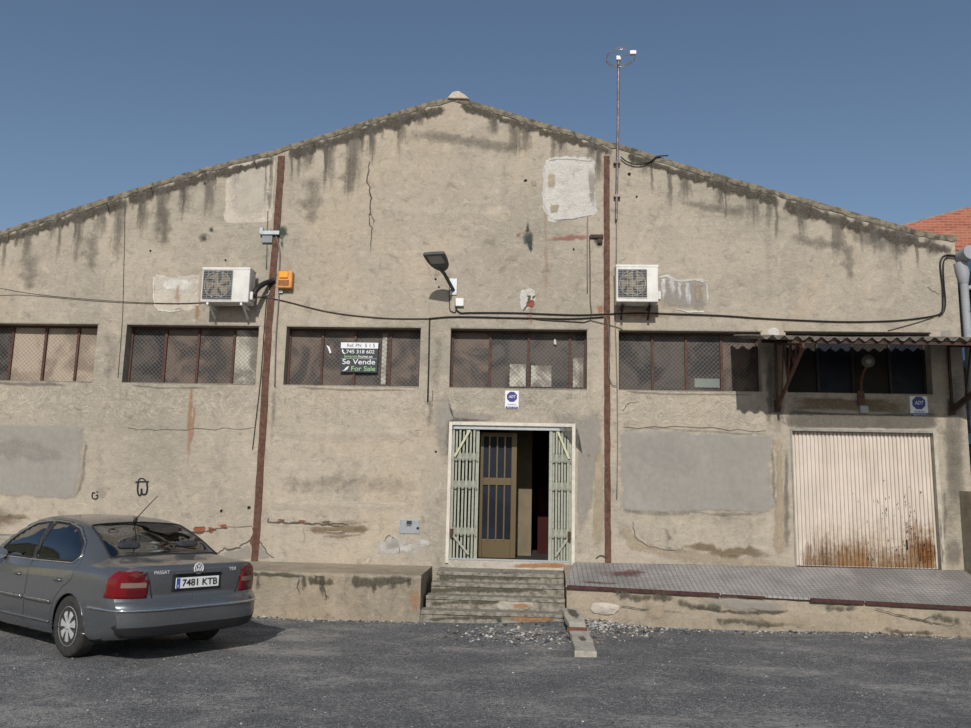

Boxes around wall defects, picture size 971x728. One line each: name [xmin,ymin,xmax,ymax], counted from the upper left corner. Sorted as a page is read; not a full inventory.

water stain [289,107,443,173]
water stain [461,103,609,164]
water stain [0,157,273,252]
crack [366,162,375,251]
water stain [628,154,950,256]
flaking render [520,288,536,317]
flaking render [192,524,227,534]
crack [196,518,347,558]
corrosion [805,523,936,568]